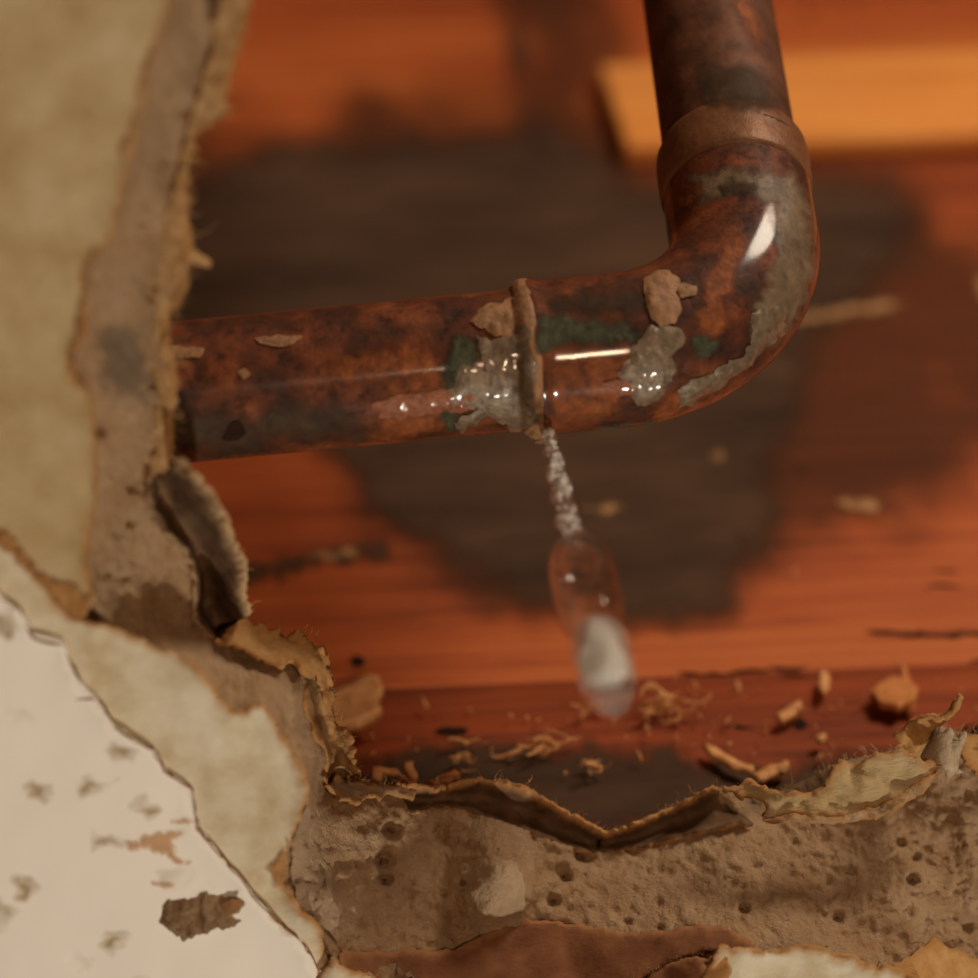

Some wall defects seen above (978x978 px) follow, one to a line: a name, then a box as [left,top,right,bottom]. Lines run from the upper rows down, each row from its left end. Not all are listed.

leakage [169,0,669,322]
leakage [330,175,978,624]
leakage [247,542,389,582]
peeling [892,693,967,777]
peeling [129,820,189,864]
peeling [159,892,245,942]
peeling [338,918,756,978]
peeling [891,937,978,978]